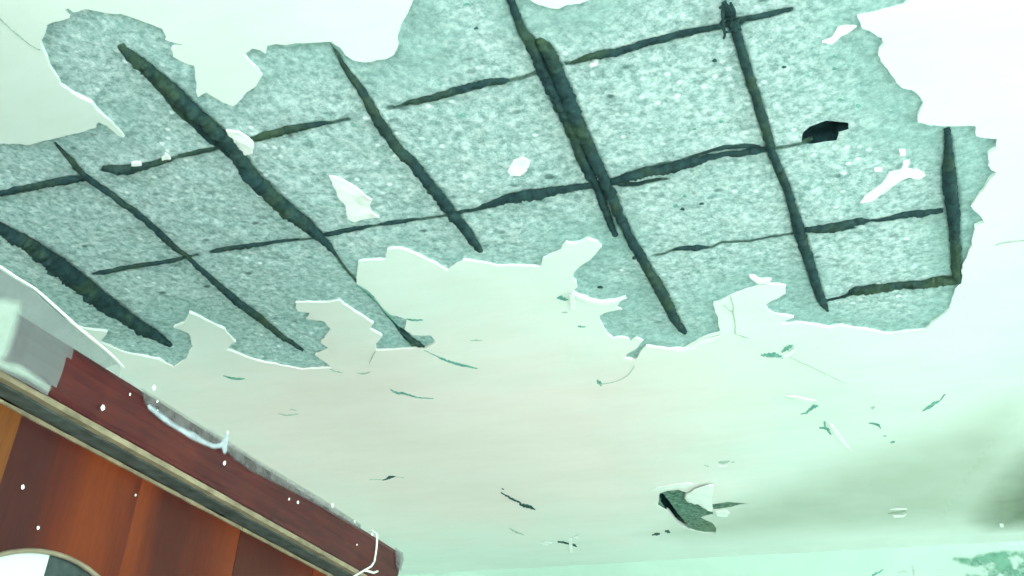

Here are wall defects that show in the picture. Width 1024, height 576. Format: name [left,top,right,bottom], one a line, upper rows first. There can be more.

spalling [0,0,996,368]
crack [501,488,536,535]
spalling [649,482,745,532]